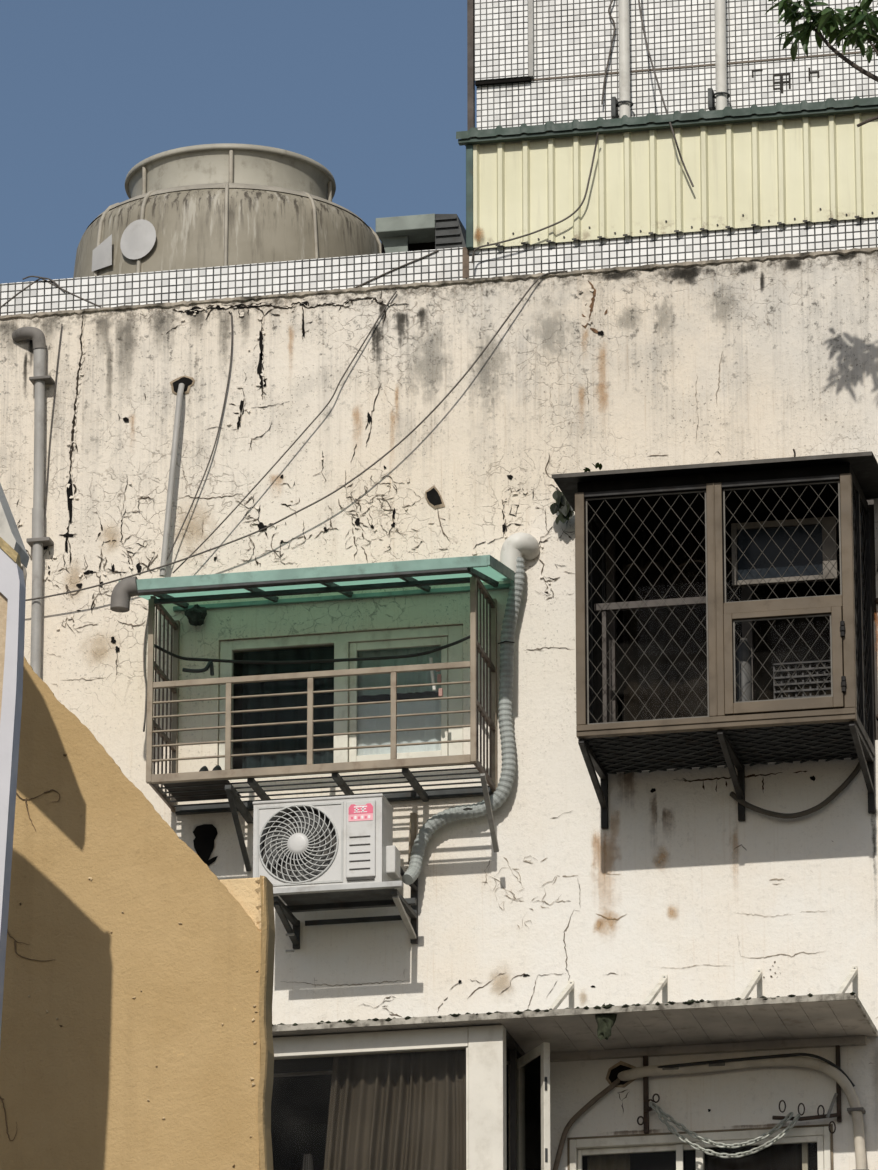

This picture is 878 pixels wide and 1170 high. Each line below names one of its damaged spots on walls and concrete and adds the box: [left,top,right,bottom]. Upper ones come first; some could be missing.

damp [667,267,709,283]
damp [740,265,764,290]
damp [785,260,800,269]
crack [166,291,407,449]
crack [17,315,575,680]
crack [438,856,625,1011]